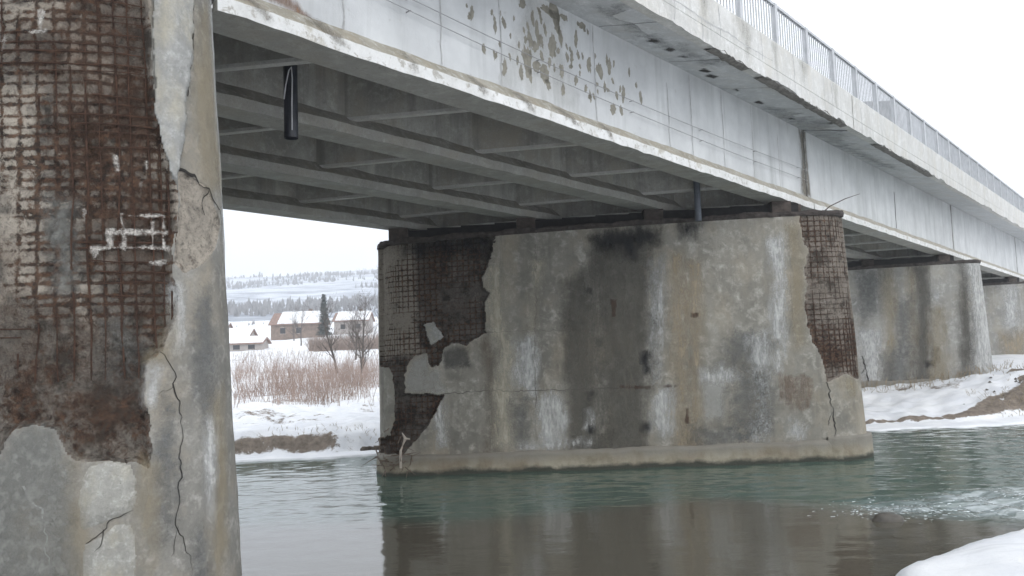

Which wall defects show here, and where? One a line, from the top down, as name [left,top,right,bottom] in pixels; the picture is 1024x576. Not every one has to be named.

crack [86,510,133,551]
spalling [0,0,220,468]
crack [160,352,192,566]
crack [179,168,222,221]
spalling [378,236,496,456]
water stain [435,403,446,446]
water stain [488,229,670,449]
water stain [696,238,788,445]
spalling [799,215,859,382]
crack [826,382,836,434]